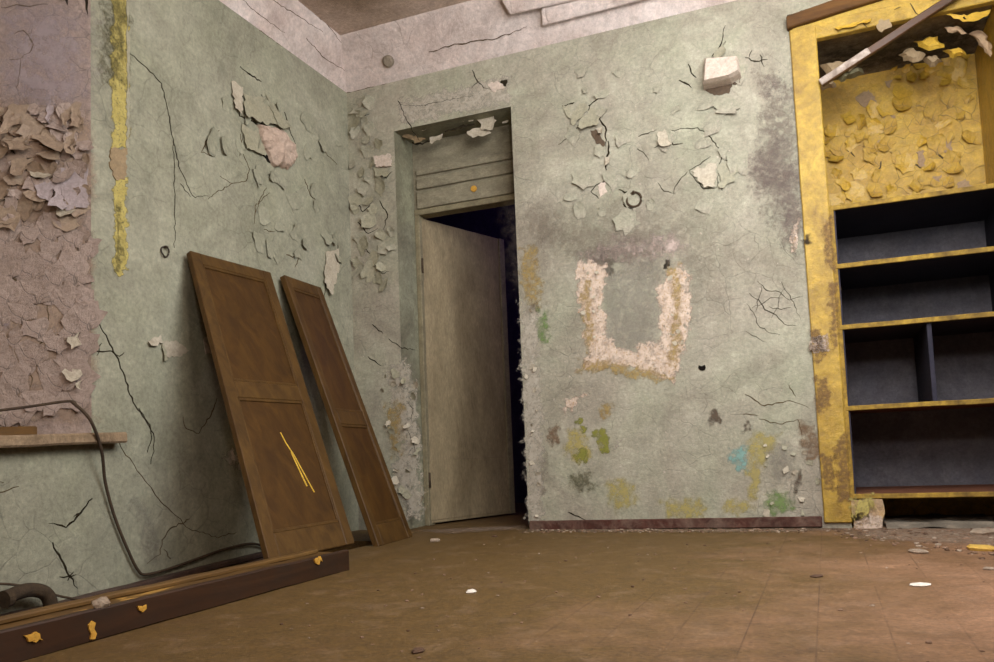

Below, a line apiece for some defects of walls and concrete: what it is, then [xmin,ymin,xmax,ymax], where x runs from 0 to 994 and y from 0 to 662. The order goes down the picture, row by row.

crack [243,0,525,140]
peeling [0,0,131,427]
crack [126,49,343,265]
damp [754,75,801,252]
crack [49,498,93,589]
crack [97,324,235,564]
peeling [368,324,425,520]
peeling [575,234,692,384]
crack [746,284,803,342]
peeling [723,421,883,529]
peeling [814,375,831,413]
peeling [809,283,839,363]